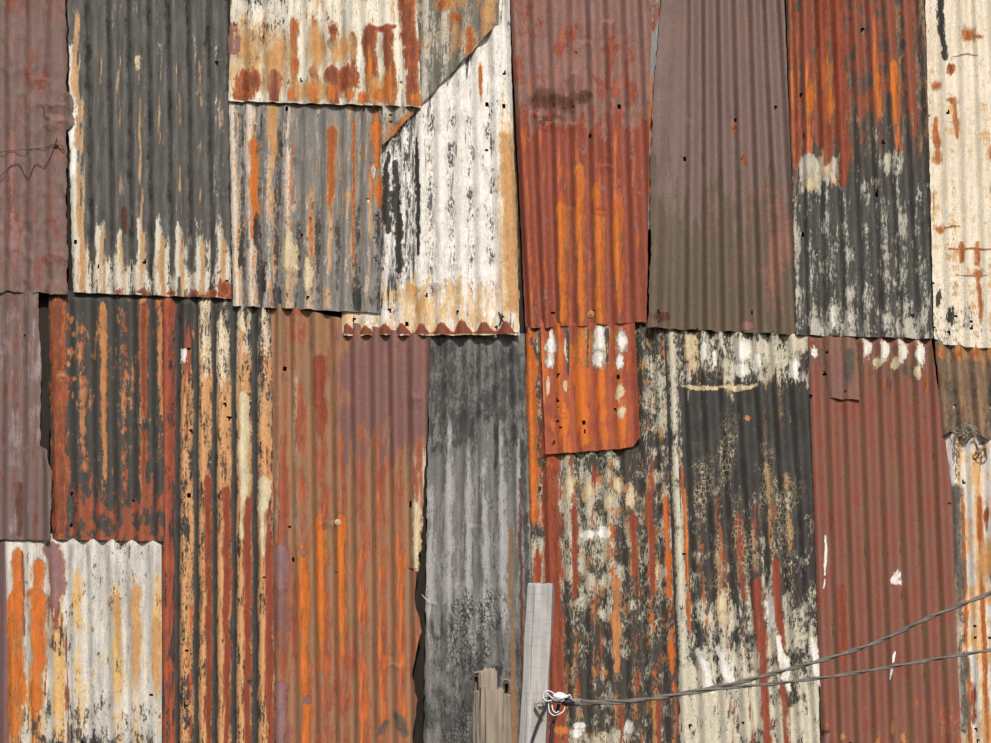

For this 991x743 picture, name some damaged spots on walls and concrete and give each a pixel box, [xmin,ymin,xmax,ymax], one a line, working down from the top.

corrosion [232,0,422,212]
corrosion [98,301,109,481]
peeling [381,150,405,274]
peeling [414,131,451,270]
corrosion [555,163,621,368]
peeling [682,330,762,393]
peeling [864,312,925,380]
corrosion [204,475,253,743]
corrosion [264,508,348,743]
peeling [694,645,735,694]
peeling [764,587,792,693]
corrosion [971,495,991,743]